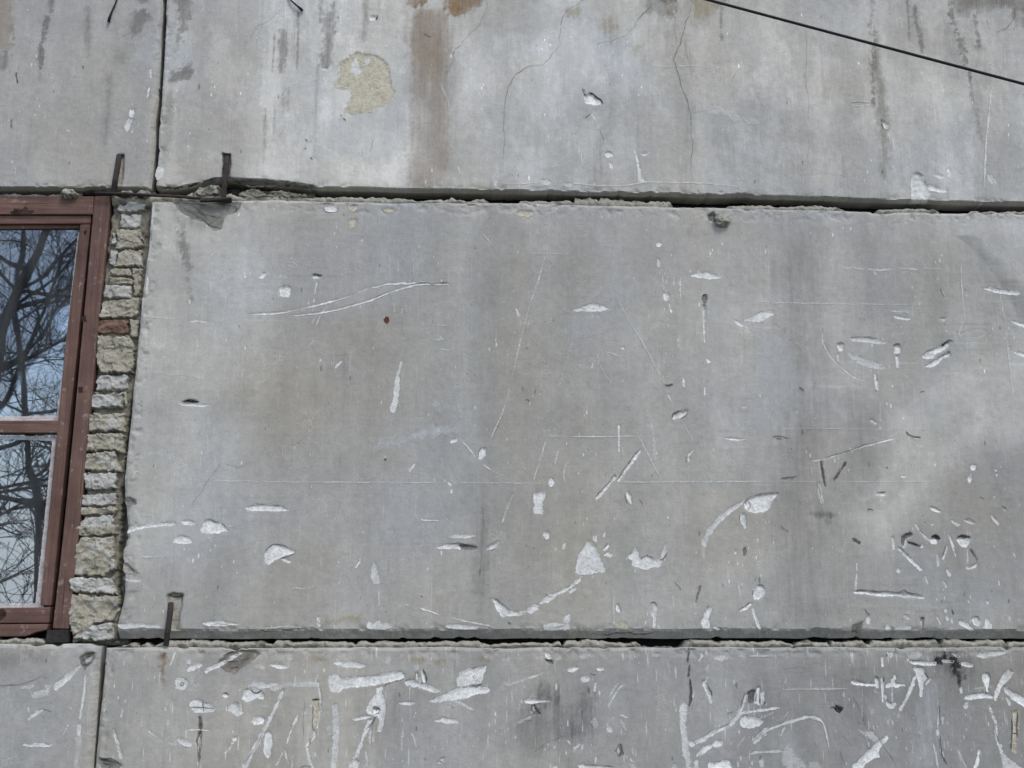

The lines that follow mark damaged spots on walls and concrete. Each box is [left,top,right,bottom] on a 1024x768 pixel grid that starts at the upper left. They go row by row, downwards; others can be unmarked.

corrosion [449,0,480,16]
peeling [324,51,395,120]
spalling [173,519,234,544]
spalling [264,544,295,565]
spalling [492,532,613,624]
spalling [628,544,667,570]
spalling [702,493,777,547]
spalling [178,666,490,768]